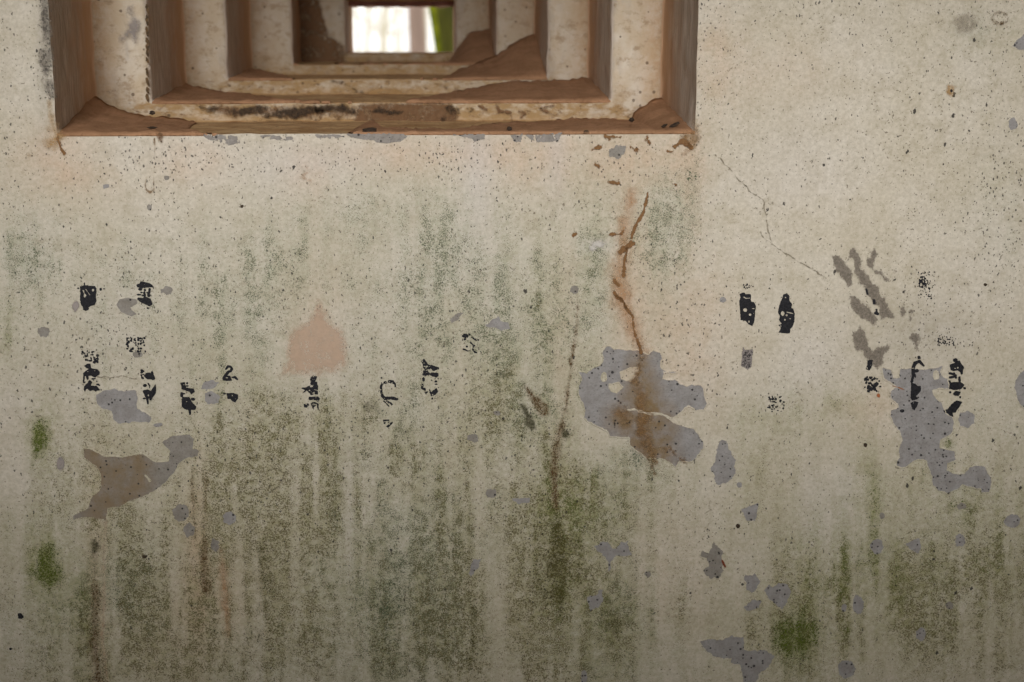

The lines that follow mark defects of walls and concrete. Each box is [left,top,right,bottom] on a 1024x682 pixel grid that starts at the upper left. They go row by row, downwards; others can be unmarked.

corrosion [592,134,651,168]
corrosion [667,130,698,152]
corrosion [609,192,648,354]
peeling [72,387,201,522]
water stain [550,306,578,508]
peeling [577,345,742,488]
peeling [880,364,993,509]
water stain [88,537,105,682]
peeling [698,540,726,580]
peeling [699,634,776,682]